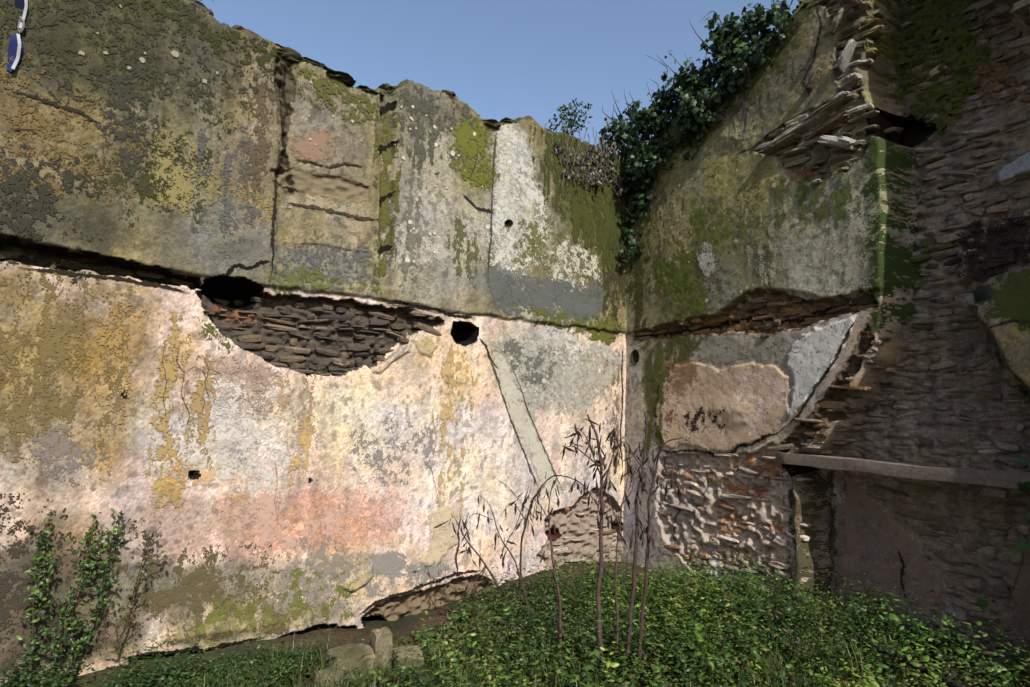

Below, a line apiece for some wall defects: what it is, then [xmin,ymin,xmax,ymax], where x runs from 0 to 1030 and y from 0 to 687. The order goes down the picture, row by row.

crack [11,91,98,123]
crack [18,267,189,293]
water stain [0,0,289,487]
spalling [0,235,445,377]
crack [216,60,399,285]
water stain [595,161,695,466]
water stain [700,206,786,320]
spalling [750,0,904,184]
water stain [0,353,436,687]
spalling [278,505,496,638]
water stain [683,406,726,434]
peeling [536,288,879,596]